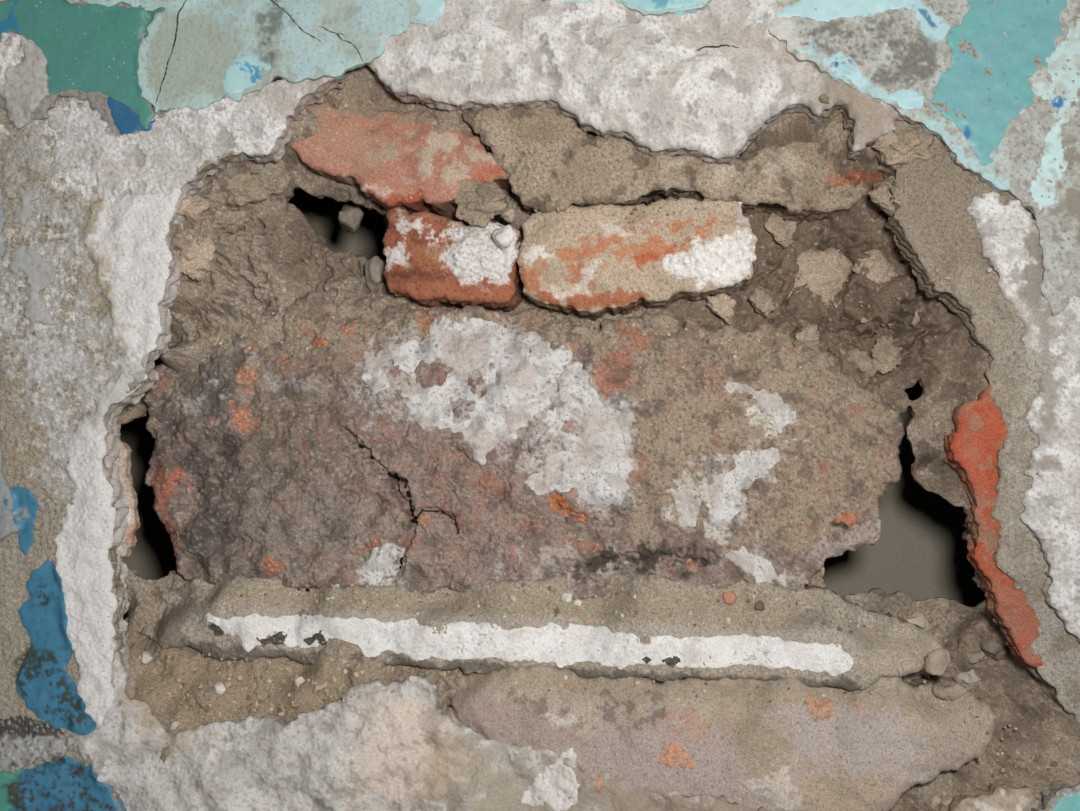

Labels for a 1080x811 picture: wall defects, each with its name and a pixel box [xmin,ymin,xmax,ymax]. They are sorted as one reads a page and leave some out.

crack [156,0,187,102]
crack [271,0,364,62]
peeling [776,0,1080,210]
flaking render [0,0,992,516]
flaking render [967,191,1080,643]
flaking render [0,144,743,811]
crack [354,437,460,538]
spalling [834,512,859,527]
spalling [805,566,826,588]
spalling [804,695,835,722]
spalling [840,572,1080,811]